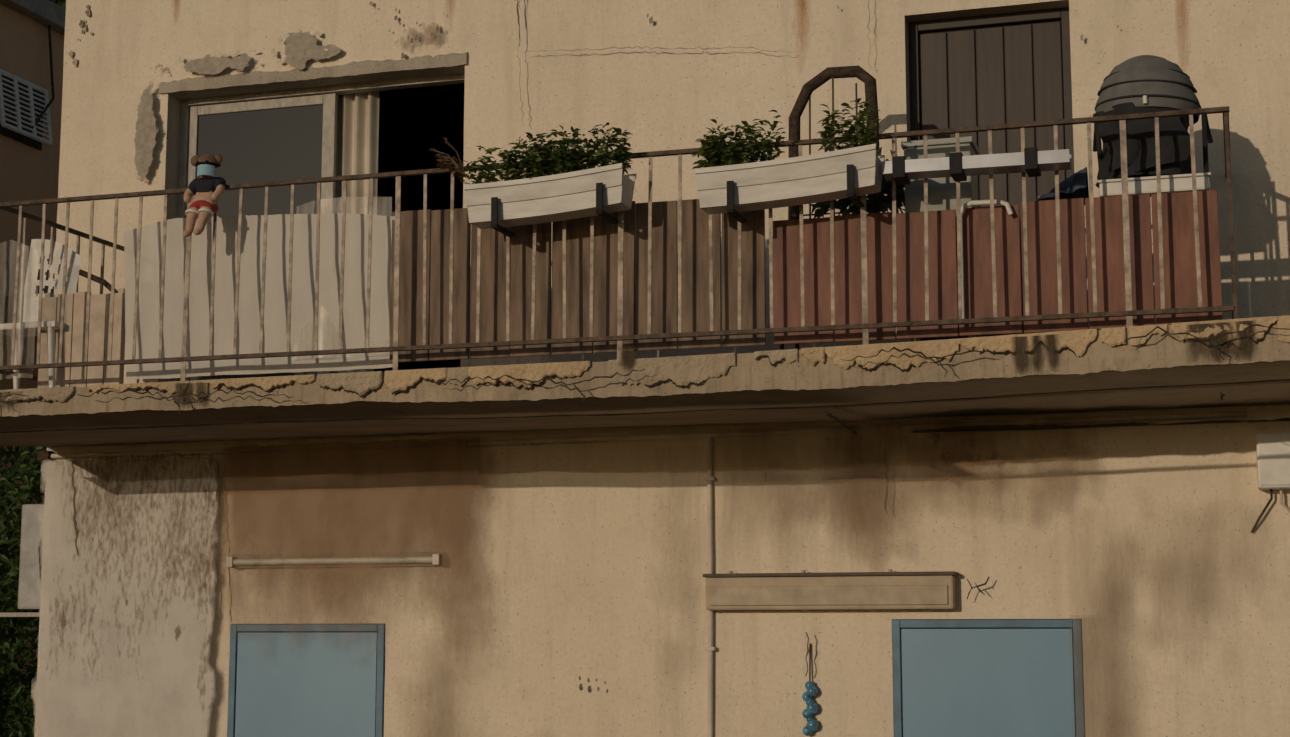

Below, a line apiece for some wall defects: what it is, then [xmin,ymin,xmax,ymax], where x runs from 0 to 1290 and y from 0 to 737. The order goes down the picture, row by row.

peeling [134,29,341,182]
spalling [0,361,592,403]
damp [621,347,634,368]
spalling [608,353,736,388]
spalling [754,315,1290,372]
damp [1014,334,1056,373]
damp [0,379,1290,607]